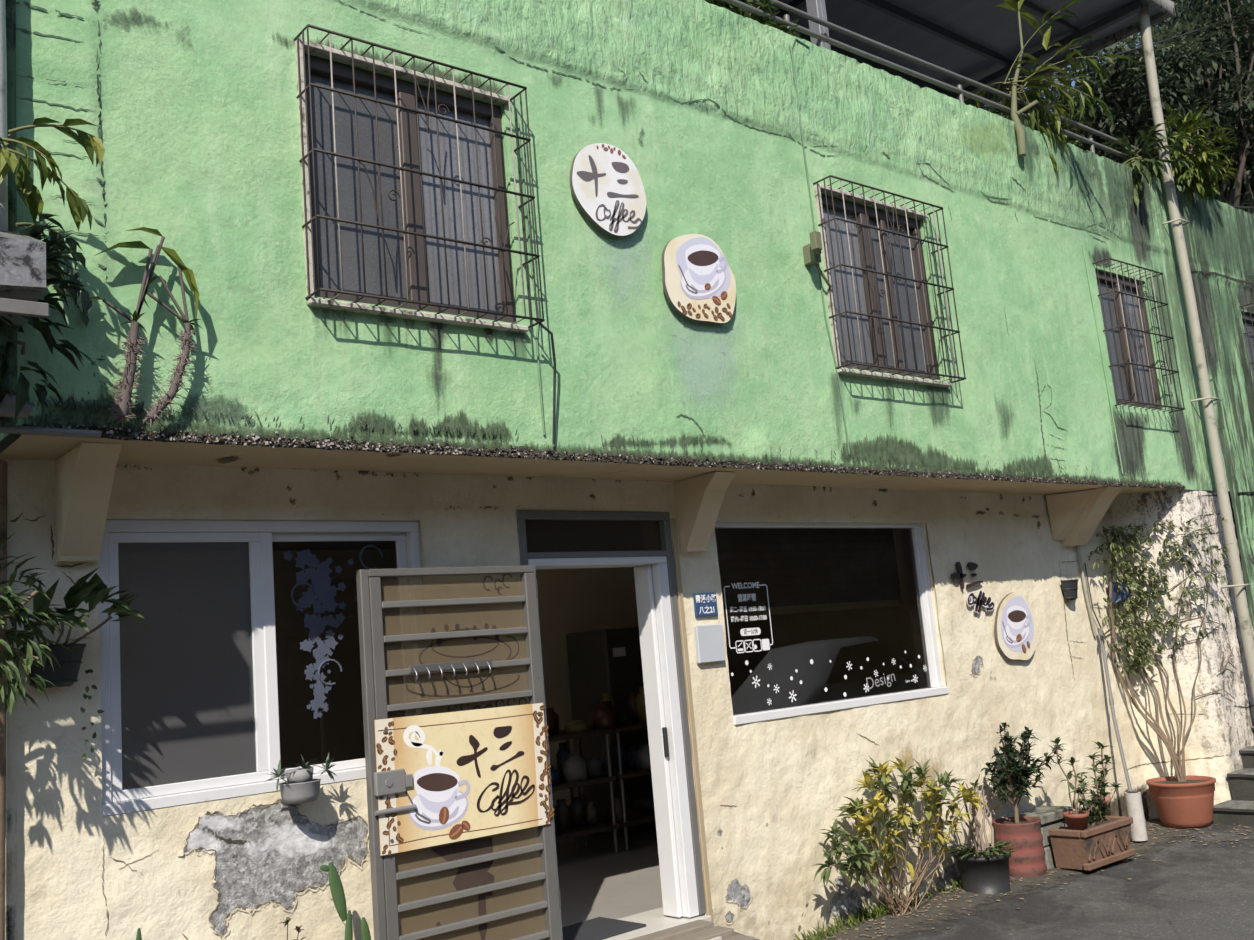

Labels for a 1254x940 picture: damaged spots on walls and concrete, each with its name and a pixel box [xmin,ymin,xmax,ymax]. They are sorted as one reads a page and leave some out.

crack [16,1,109,279]
crack [494,45,837,156]
water stain [1067,158,1089,194]
water stain [1106,166,1151,264]
water stain [1191,206,1254,412]
water stain [165,389,253,426]
water stain [832,376,840,431]
water stain [928,387,952,423]
water stain [1113,411,1148,479]
water stain [1168,399,1197,482]
peeling [177,798,370,940]
peeling [705,877,753,925]